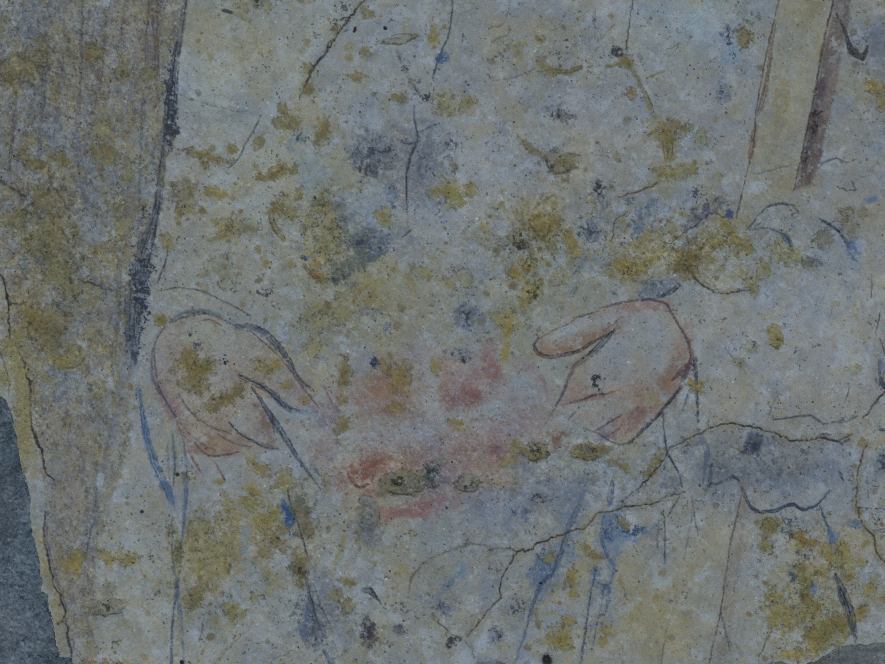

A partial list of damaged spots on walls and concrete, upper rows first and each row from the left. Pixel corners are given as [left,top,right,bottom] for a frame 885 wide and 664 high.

crack [297,0,368,105]
crack [0,270,33,398]
crack [32,422,56,482]
flaking render [0,397,74,664]
crack [43,510,73,658]
crack [407,390,885,659]
flaking render [807,643,885,664]